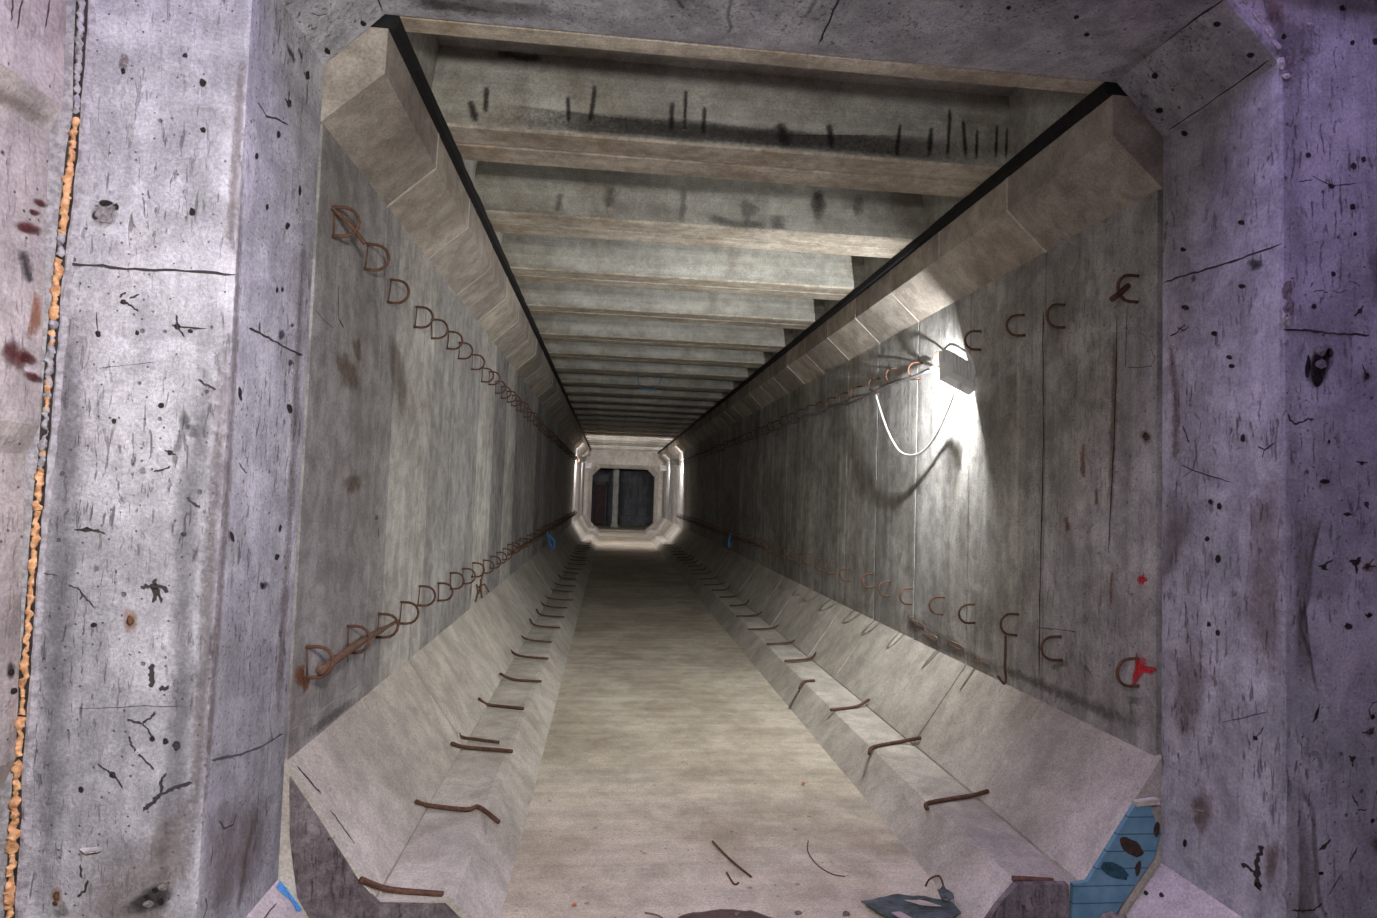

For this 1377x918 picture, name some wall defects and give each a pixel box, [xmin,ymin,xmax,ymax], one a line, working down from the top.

crack [818,0,840,44]
corrosion [17,199,47,233]
spalling [1305,346,1334,387]